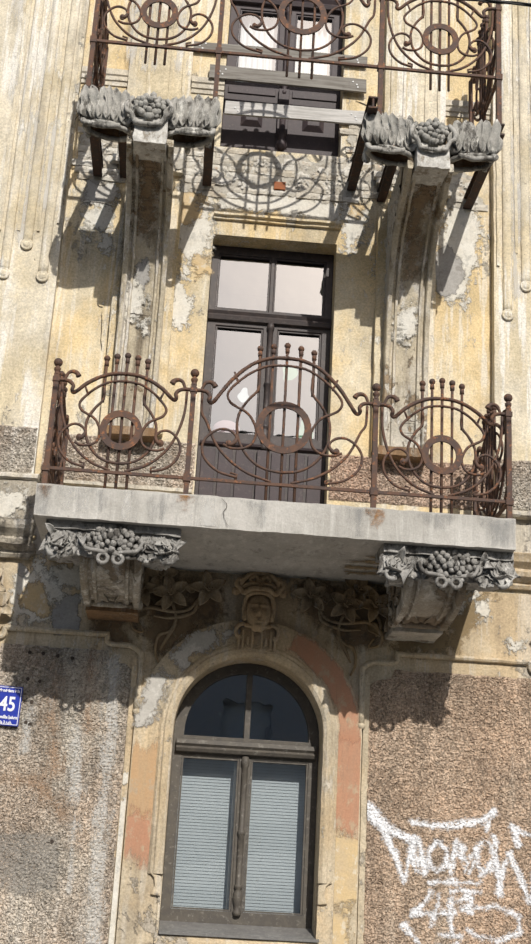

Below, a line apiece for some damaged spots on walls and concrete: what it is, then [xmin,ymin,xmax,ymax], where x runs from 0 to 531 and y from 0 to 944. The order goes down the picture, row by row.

peeling [176,2,189,73]
flaking render [18,111,126,256]
spalling [136,160,160,239]
flaking render [172,124,400,332]
peeling [435,172,490,311]
peeling [119,257,157,337]
peeling [391,298,418,351]
peeling [0,482,29,518]
peeling [8,526,83,636]
peeling [132,620,245,728]